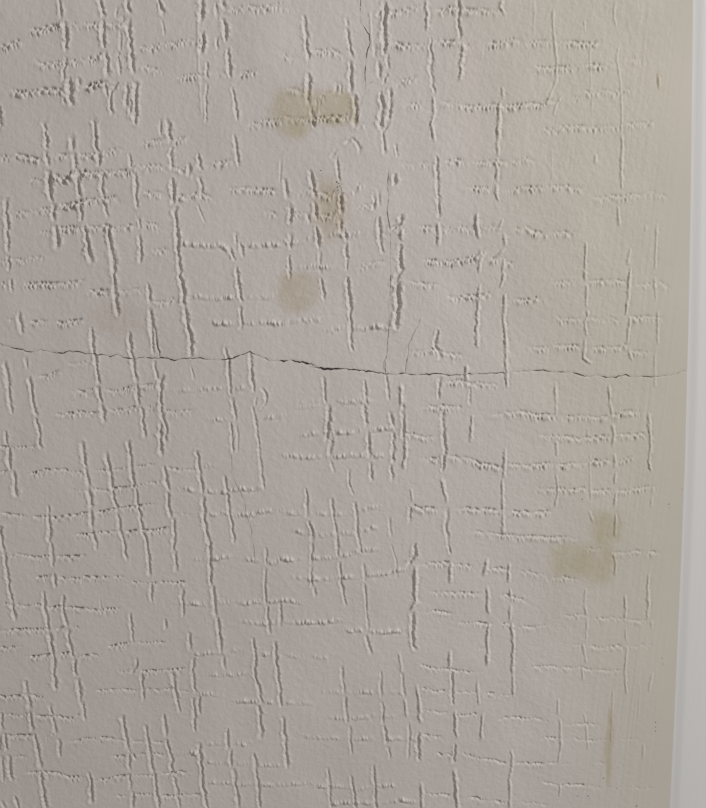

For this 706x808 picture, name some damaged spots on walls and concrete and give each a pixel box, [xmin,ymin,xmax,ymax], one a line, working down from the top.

crack [3,319,509,376]